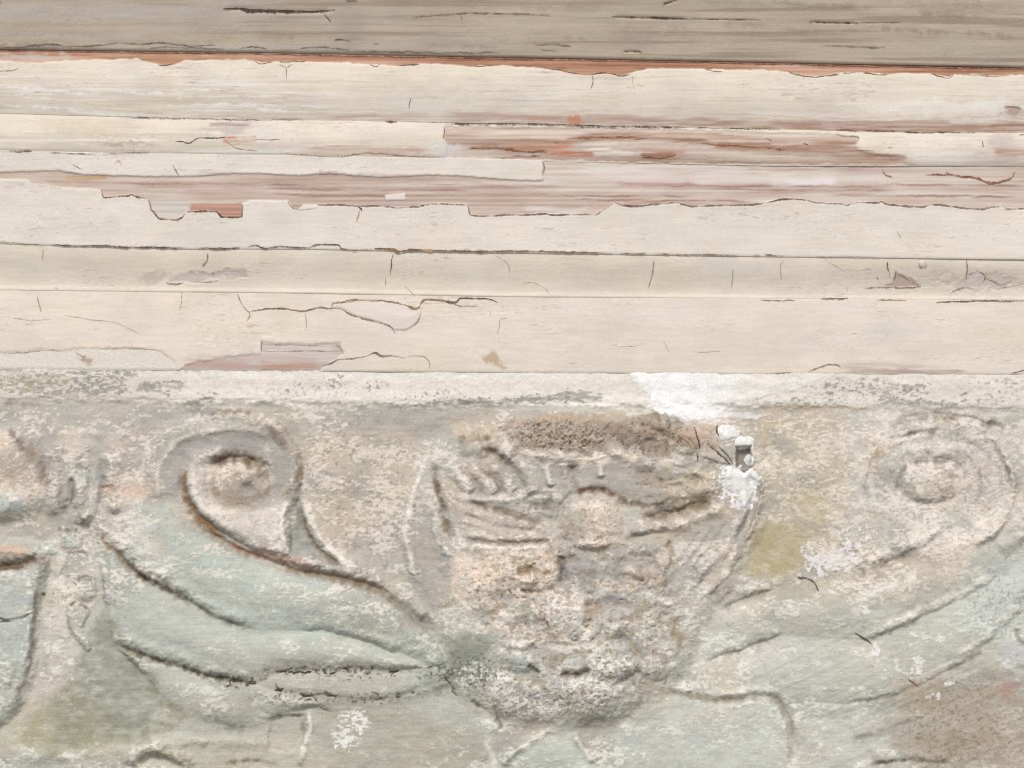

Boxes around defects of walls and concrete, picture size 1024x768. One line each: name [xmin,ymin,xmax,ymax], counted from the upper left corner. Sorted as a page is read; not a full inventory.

peeling [0,37,1024,78]
peeling [0,103,1024,221]
crack [927,172,1015,184]
peeling [870,259,1024,298]
flaking render [0,294,722,462]
water stain [666,406,772,425]
flaking render [438,492,629,639]